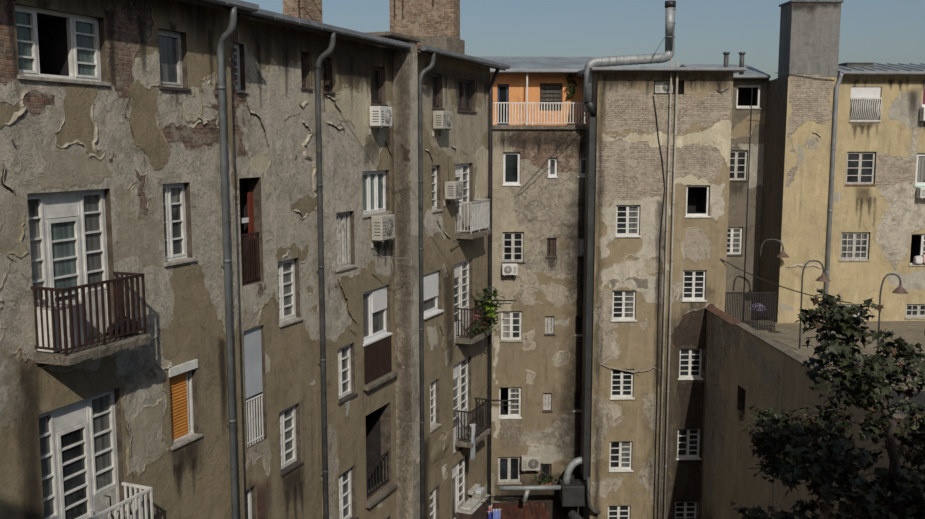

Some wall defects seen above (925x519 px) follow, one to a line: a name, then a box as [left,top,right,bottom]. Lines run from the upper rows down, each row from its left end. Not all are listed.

crack [246,64,269,145]
crack [299,95,345,191]
flaking render [785,75,834,188]
flaking render [888,90,925,129]
flaking render [0,0,395,477]
flaking render [396,53,766,391]
flaking render [874,181,925,290]
crack [338,279,358,332]
water stain [174,442,198,488]
flaking render [401,405,420,519]
flaking render [491,405,502,438]
flaking render [591,394,624,463]